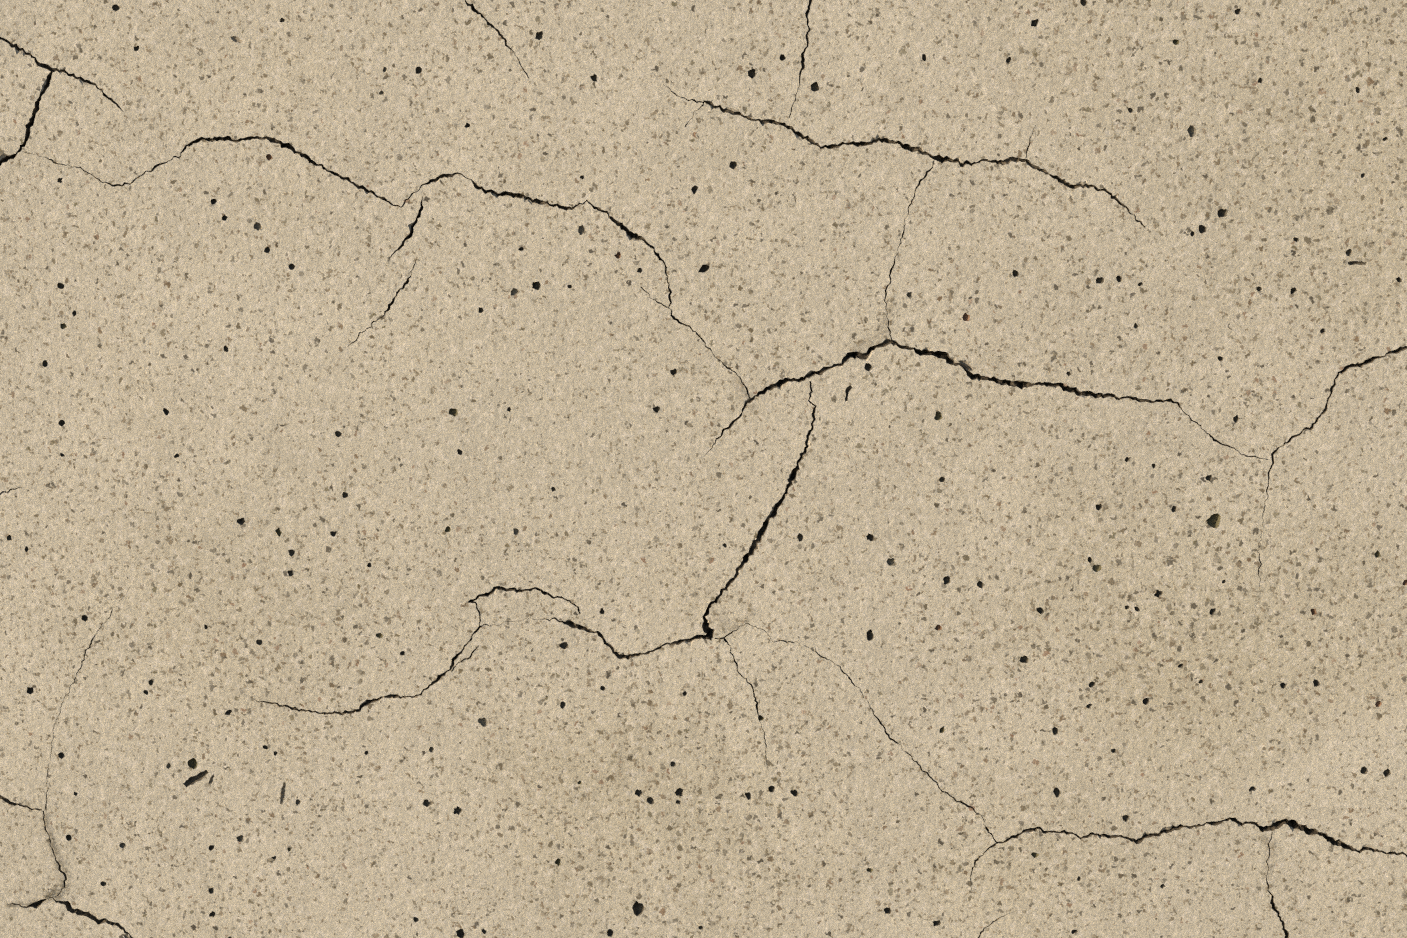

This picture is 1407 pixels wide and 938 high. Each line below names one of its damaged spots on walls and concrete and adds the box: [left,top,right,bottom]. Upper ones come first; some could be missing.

crack [465,0,529,78]
crack [789,0,813,118]
crack [0,37,1407,771]
crack [0,587,133,938]
crack [806,646,1407,938]